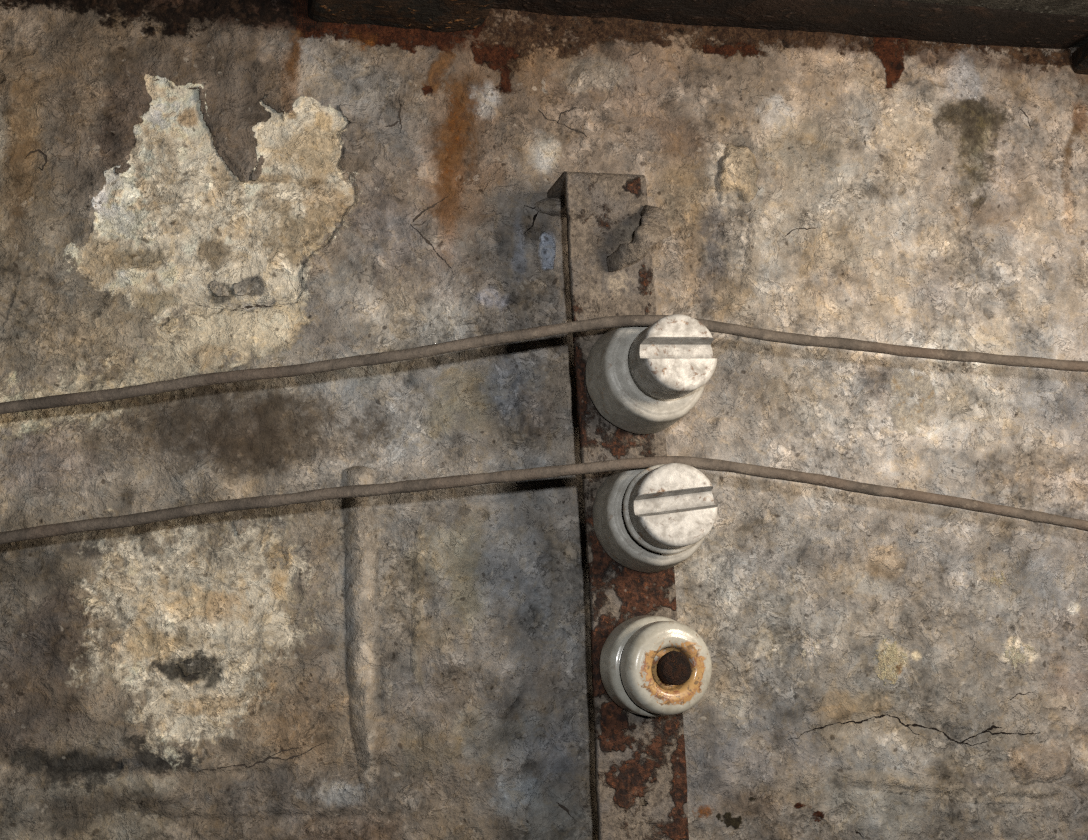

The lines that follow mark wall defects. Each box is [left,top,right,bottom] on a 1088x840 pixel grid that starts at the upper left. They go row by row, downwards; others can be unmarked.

corrosion [286,0,1080,213]
flaking render [0,74,365,440]
crack [788,714,1041,746]